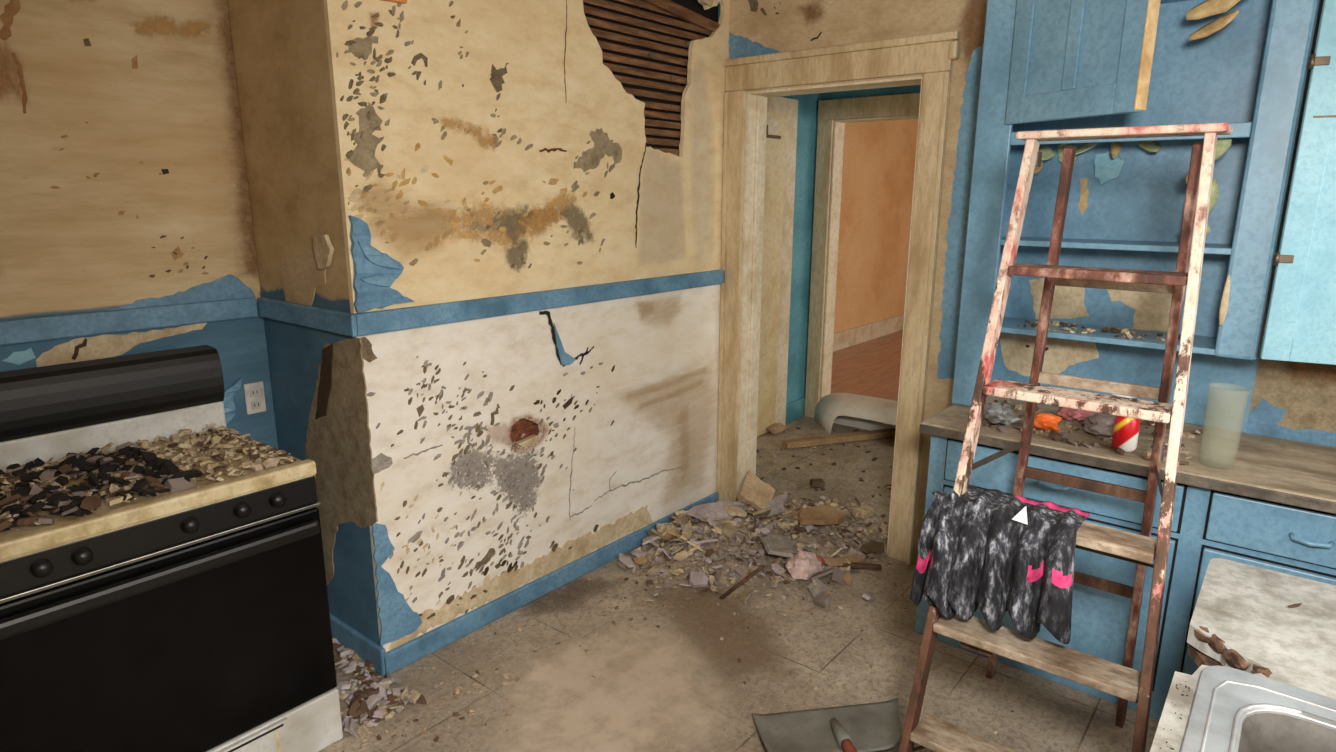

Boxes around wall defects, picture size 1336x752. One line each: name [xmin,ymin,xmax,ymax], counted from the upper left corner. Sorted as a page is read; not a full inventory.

peeling [1186,0,1240,40]
flaking render [583,0,781,156]
peeling [336,0,442,313]
damp [344,155,605,270]
crack [635,143,647,245]
peeling [999,332,1099,376]
peeling [1029,278,1089,319]
peeling [1107,289,1172,331]
flaking render [1240,350,1336,447]
peeling [305,323,652,650]